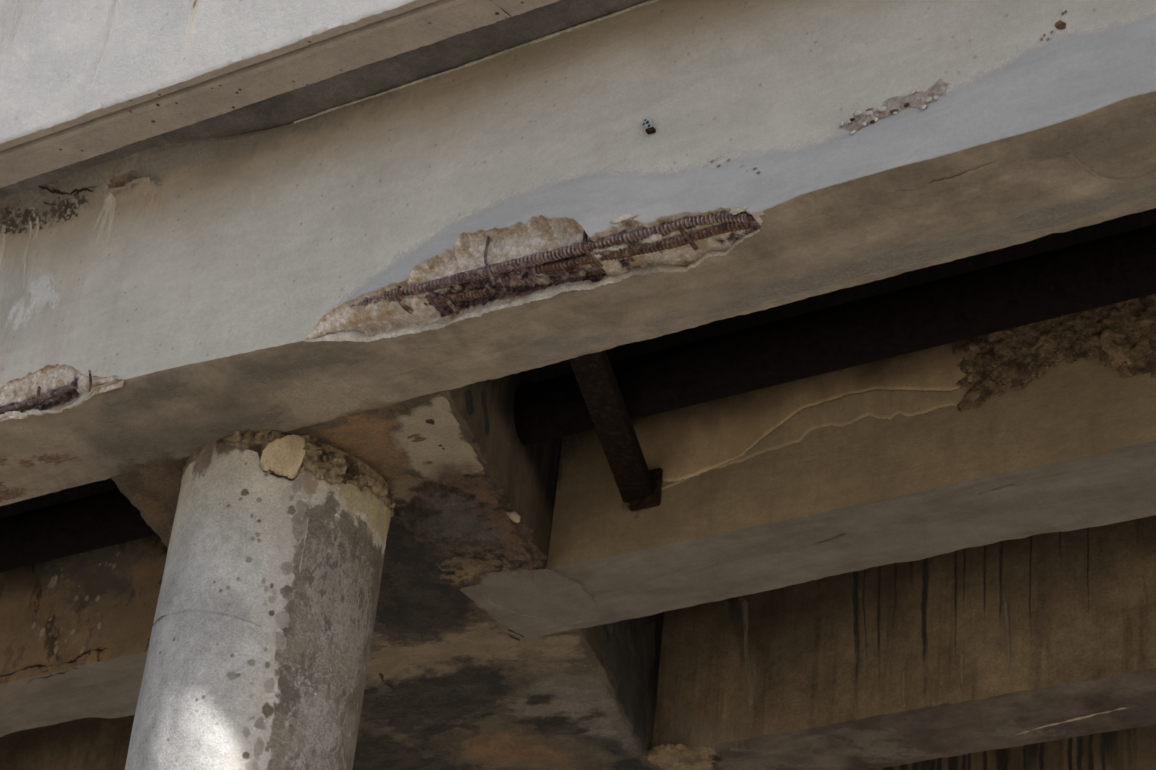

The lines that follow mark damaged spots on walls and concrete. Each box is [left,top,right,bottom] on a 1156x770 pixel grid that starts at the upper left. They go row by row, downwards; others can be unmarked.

peeling [839,79,949,134]
crack [39,186,96,205]
water stain [0,132,264,276]
spalling [301,206,766,342]
spalling [0,364,124,422]
flaking render [631,294,1156,490]
peeling [259,434,306,481]
crack [0,648,116,687]
water stain [374,501,487,637]
water stain [352,621,798,770]
water stain [852,558,928,681]
water stain [840,723,1119,770]